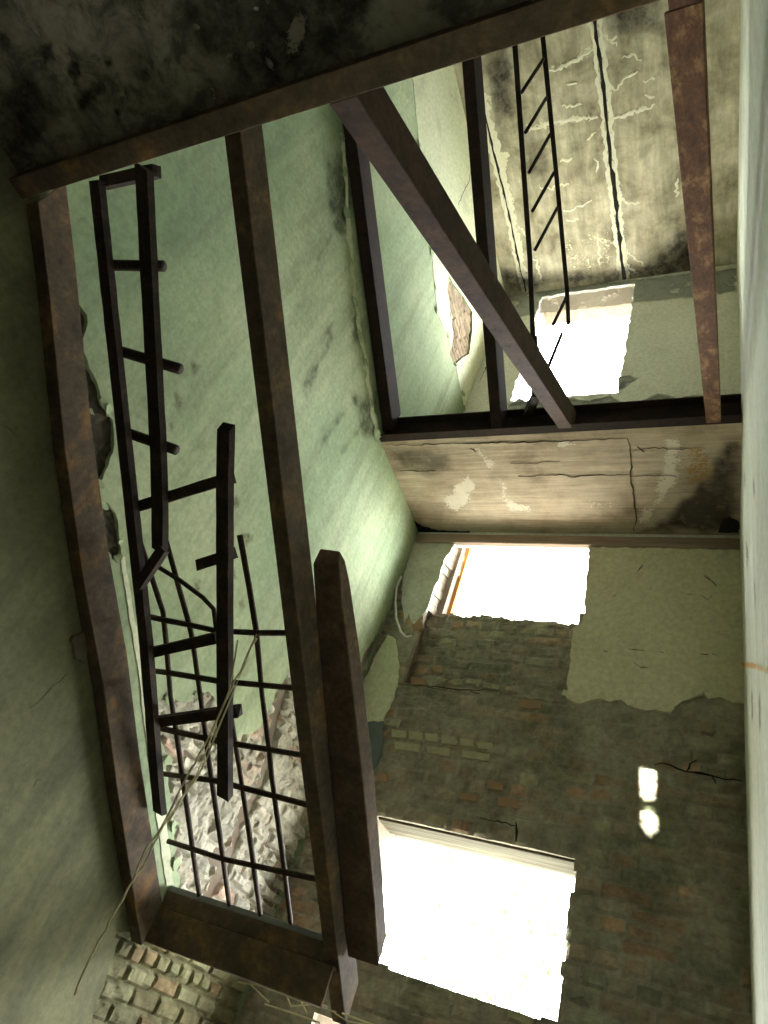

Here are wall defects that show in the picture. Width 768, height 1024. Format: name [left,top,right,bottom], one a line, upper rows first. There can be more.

peeling [413,65,476,242]
crack [529,19,655,280]
damp [565,160,628,271]
crack [673,178,681,197]
peeling [430,248,485,411]
damp [509,273,693,316]
damp [442,476,476,511]
crack [391,438,690,531]
damp [637,438,737,532]
flaking render [158,671,308,918]
crack [654,760,742,784]
flaking render [92,929,247,1024]